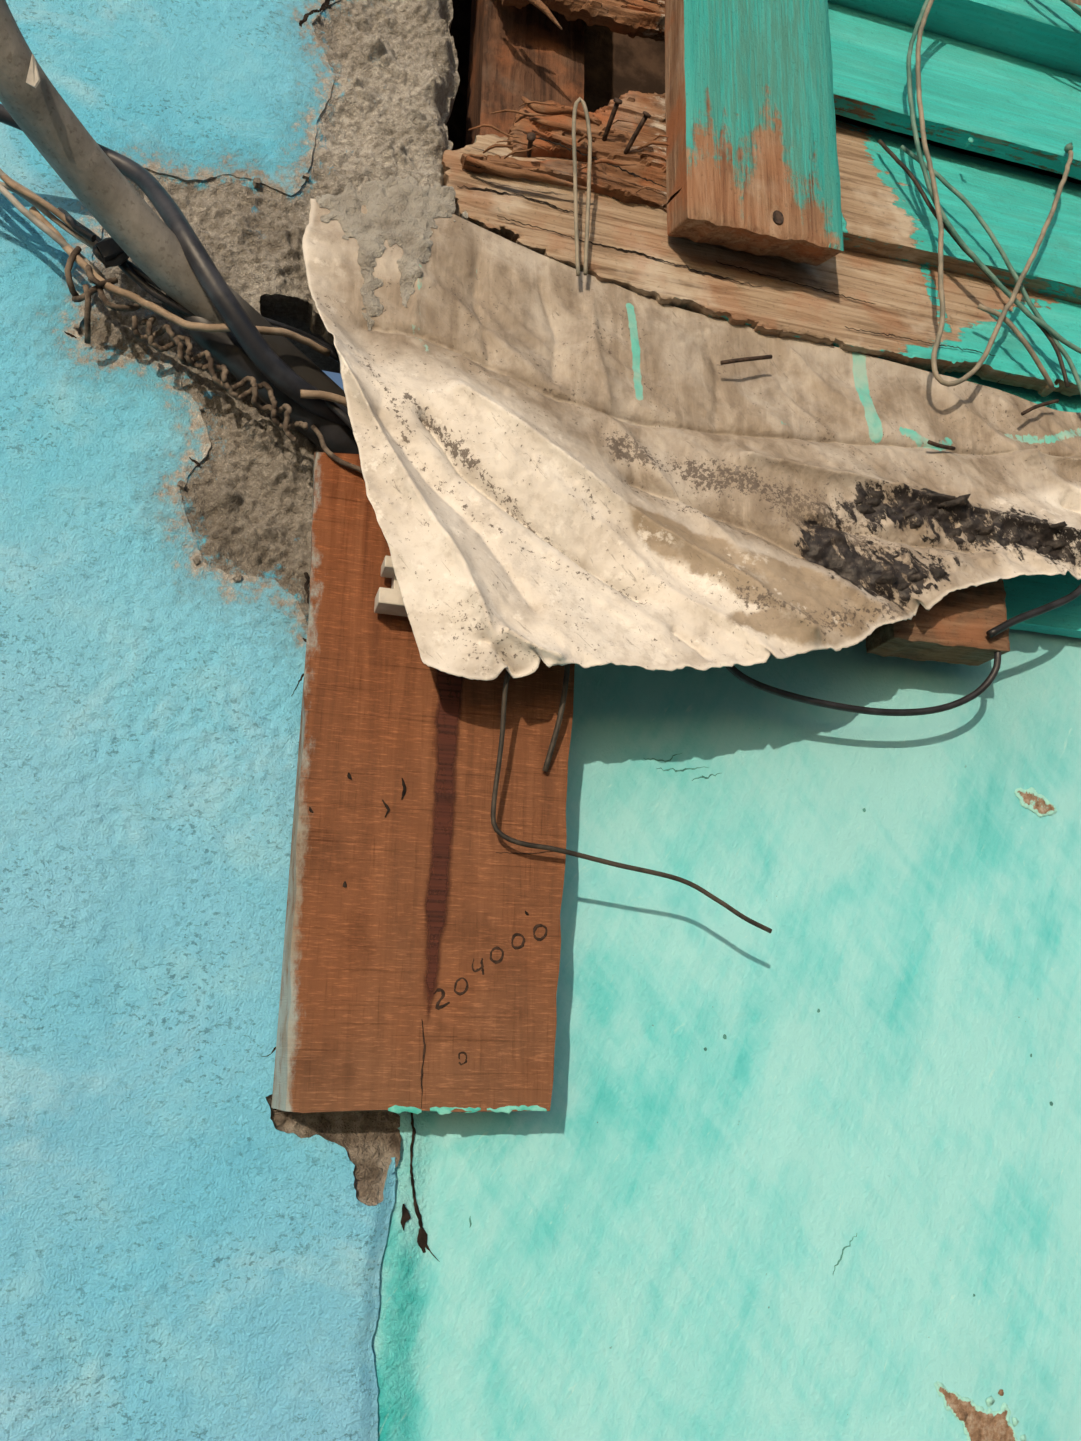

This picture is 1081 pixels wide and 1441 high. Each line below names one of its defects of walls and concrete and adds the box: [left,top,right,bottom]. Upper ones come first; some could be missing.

spalling [147,0,460,345]
spalling [64,254,324,624]
peeling [1014,787,1057,817]
spalling [266,1094,401,1206]
crack [401,1112,440,1262]
peeling [934,1381,1026,1441]